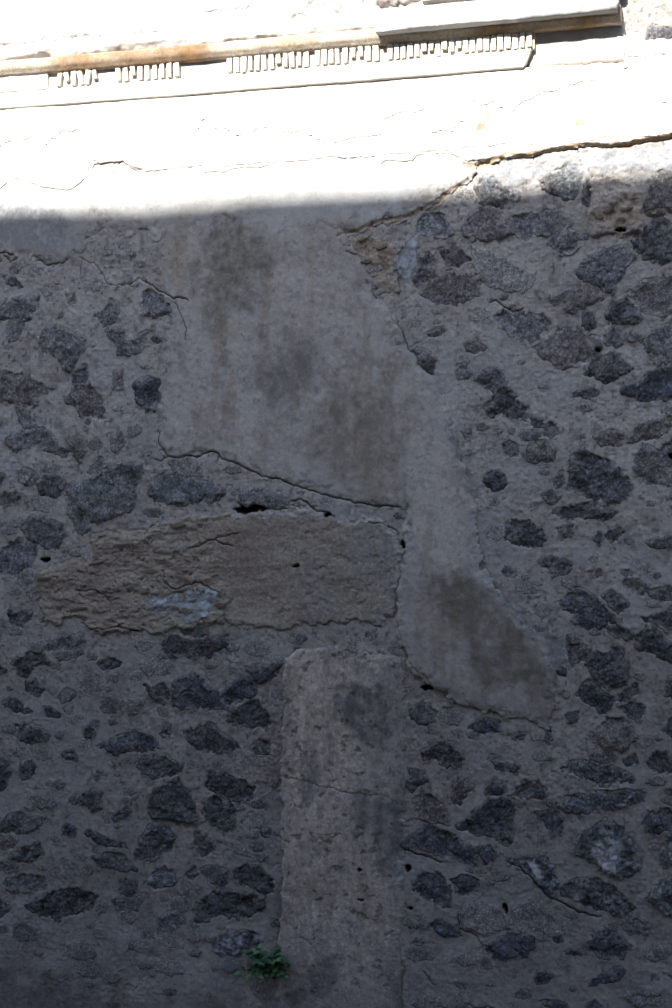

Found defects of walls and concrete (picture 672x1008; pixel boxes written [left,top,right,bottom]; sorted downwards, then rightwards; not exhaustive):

flaking render [195,80,602,173]
crack [88,133,672,235]
crack [155,432,399,530]